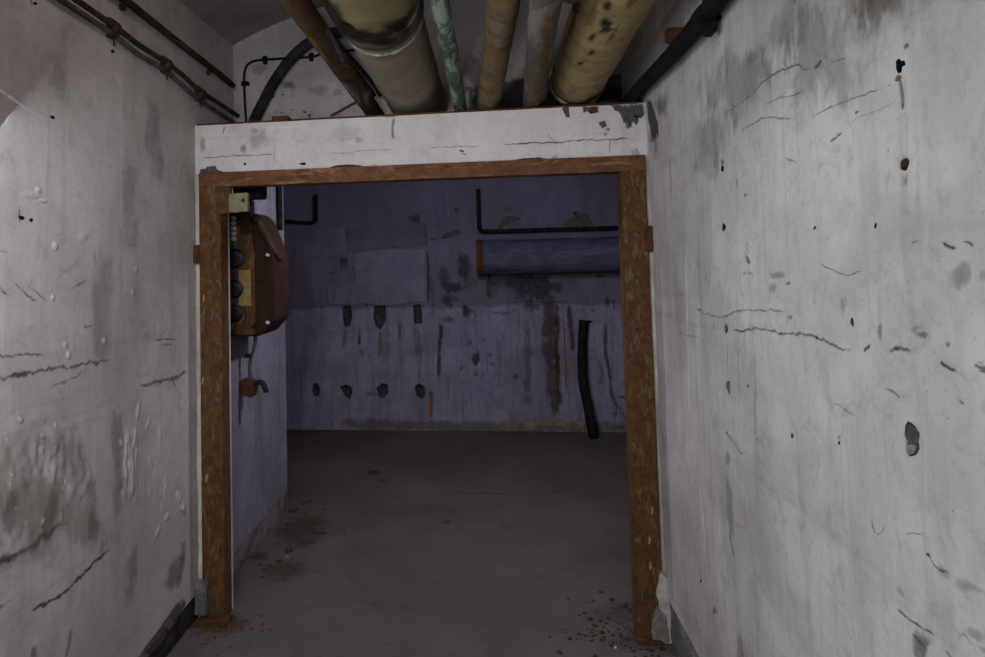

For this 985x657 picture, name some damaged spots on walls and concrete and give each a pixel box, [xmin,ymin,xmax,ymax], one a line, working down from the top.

spalling [583,106,607,128]
spalling [611,100,658,155]
crack [734,327,908,352]
crack [4,360,101,380]
spalling [905,421,920,456]
crack [33,553,105,610]